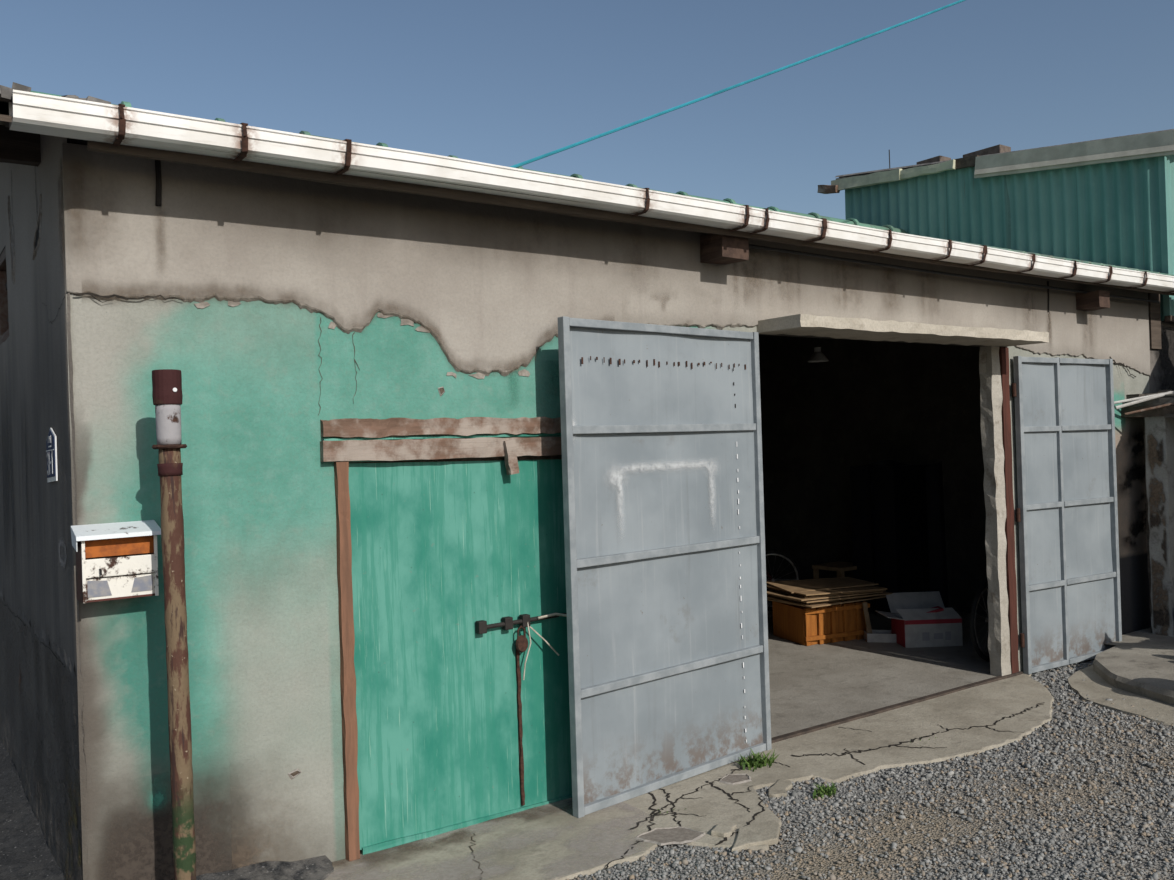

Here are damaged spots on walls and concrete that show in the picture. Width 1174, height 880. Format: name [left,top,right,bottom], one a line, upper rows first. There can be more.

crack [44,292,184,322]
flaking render [76,291,558,397]
peeling [1148,434,1169,636]
crack [775,703,1044,767]
water stain [104,804,175,880]
crack [604,766,765,870]